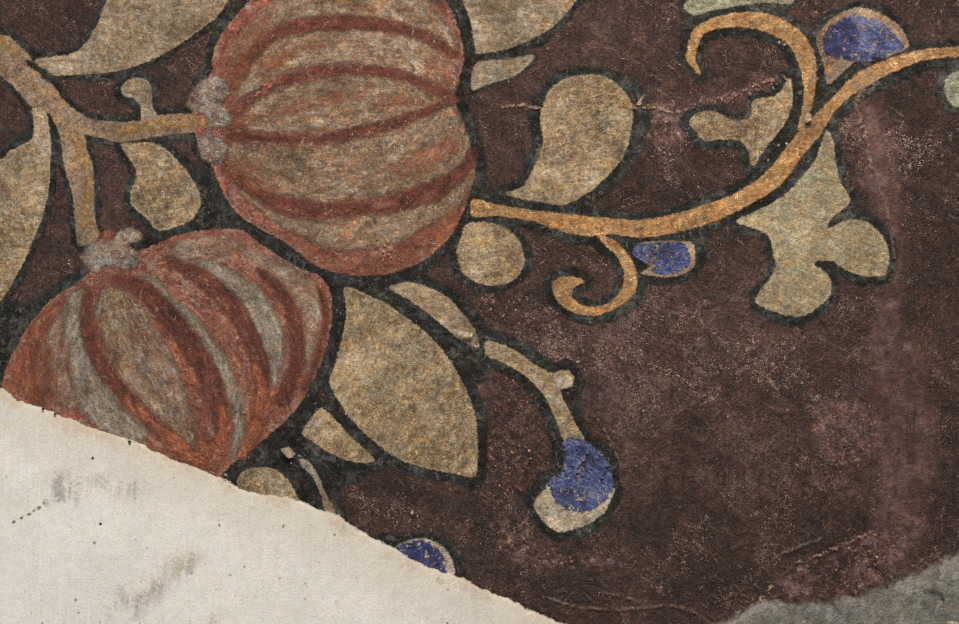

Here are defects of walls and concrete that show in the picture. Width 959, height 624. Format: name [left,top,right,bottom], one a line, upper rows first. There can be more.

peeling [281,447,300,464]
peeling [490,375,548,495]
peeling [489,520,622,573]
peeling [759,517,918,602]